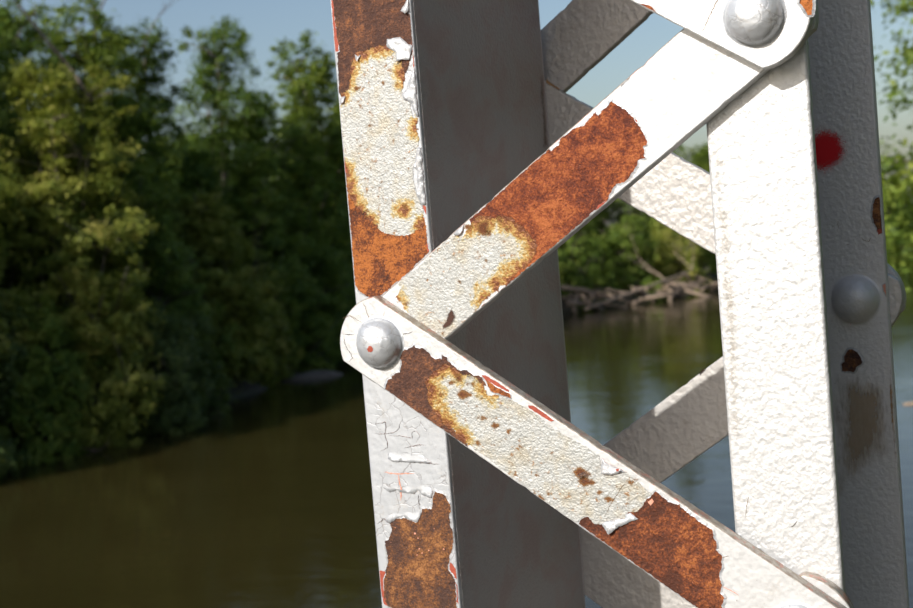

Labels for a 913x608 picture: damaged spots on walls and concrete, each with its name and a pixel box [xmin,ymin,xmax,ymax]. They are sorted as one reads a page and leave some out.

rust [331,0,414,94]
rust [343,149,430,298]
rust [469,98,649,307]
rust [384,343,488,447]
crack [378,419,433,502]
rust [380,488,459,608]
rust [577,490,727,608]